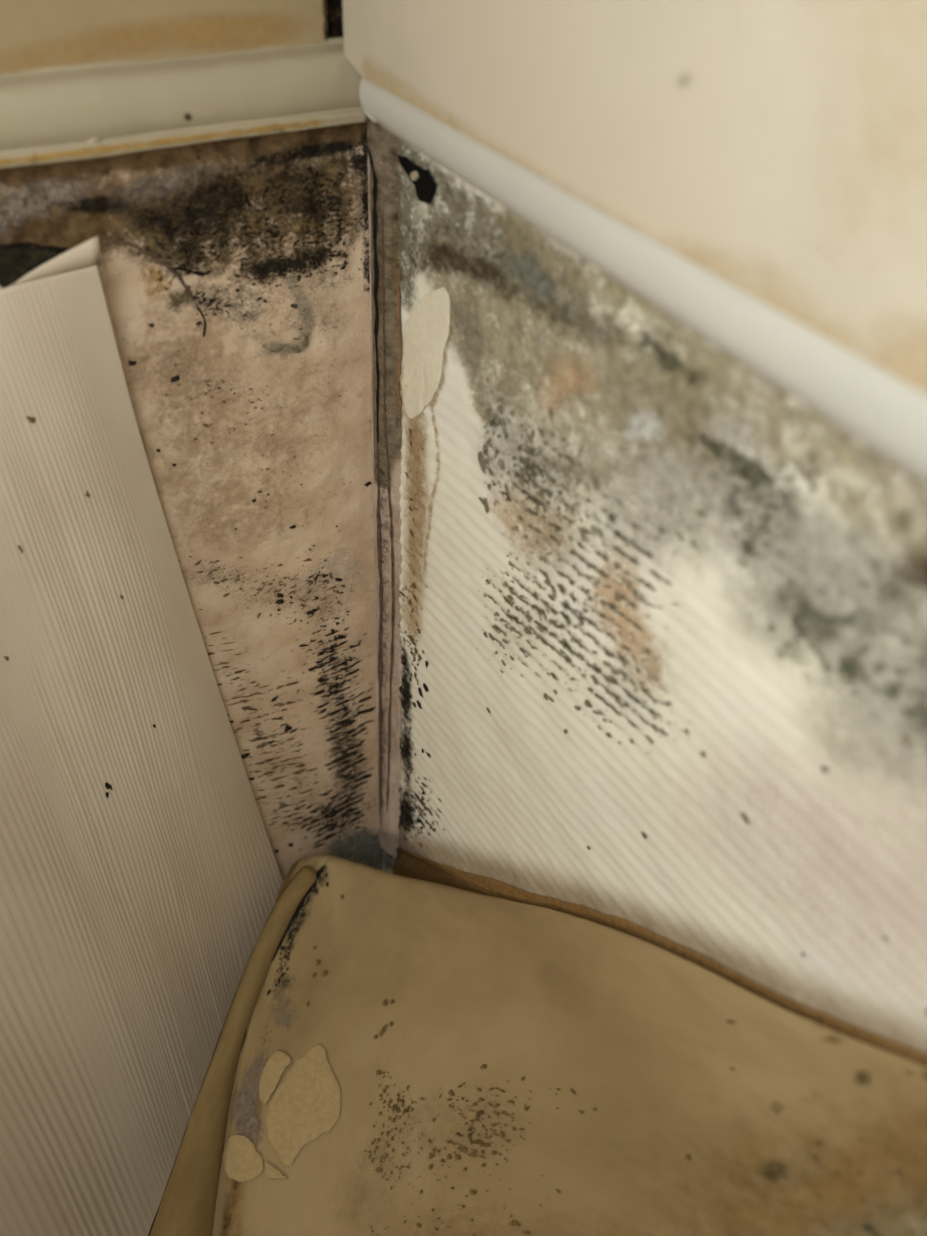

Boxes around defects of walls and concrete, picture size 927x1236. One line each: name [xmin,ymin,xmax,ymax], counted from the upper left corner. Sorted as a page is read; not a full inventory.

spalling [397,154,437,206]
peeling [401,287,450,418]
leakage [0,116,927,1078]
flaking render [222,1044,341,1182]
leakage [347,1070,544,1236]